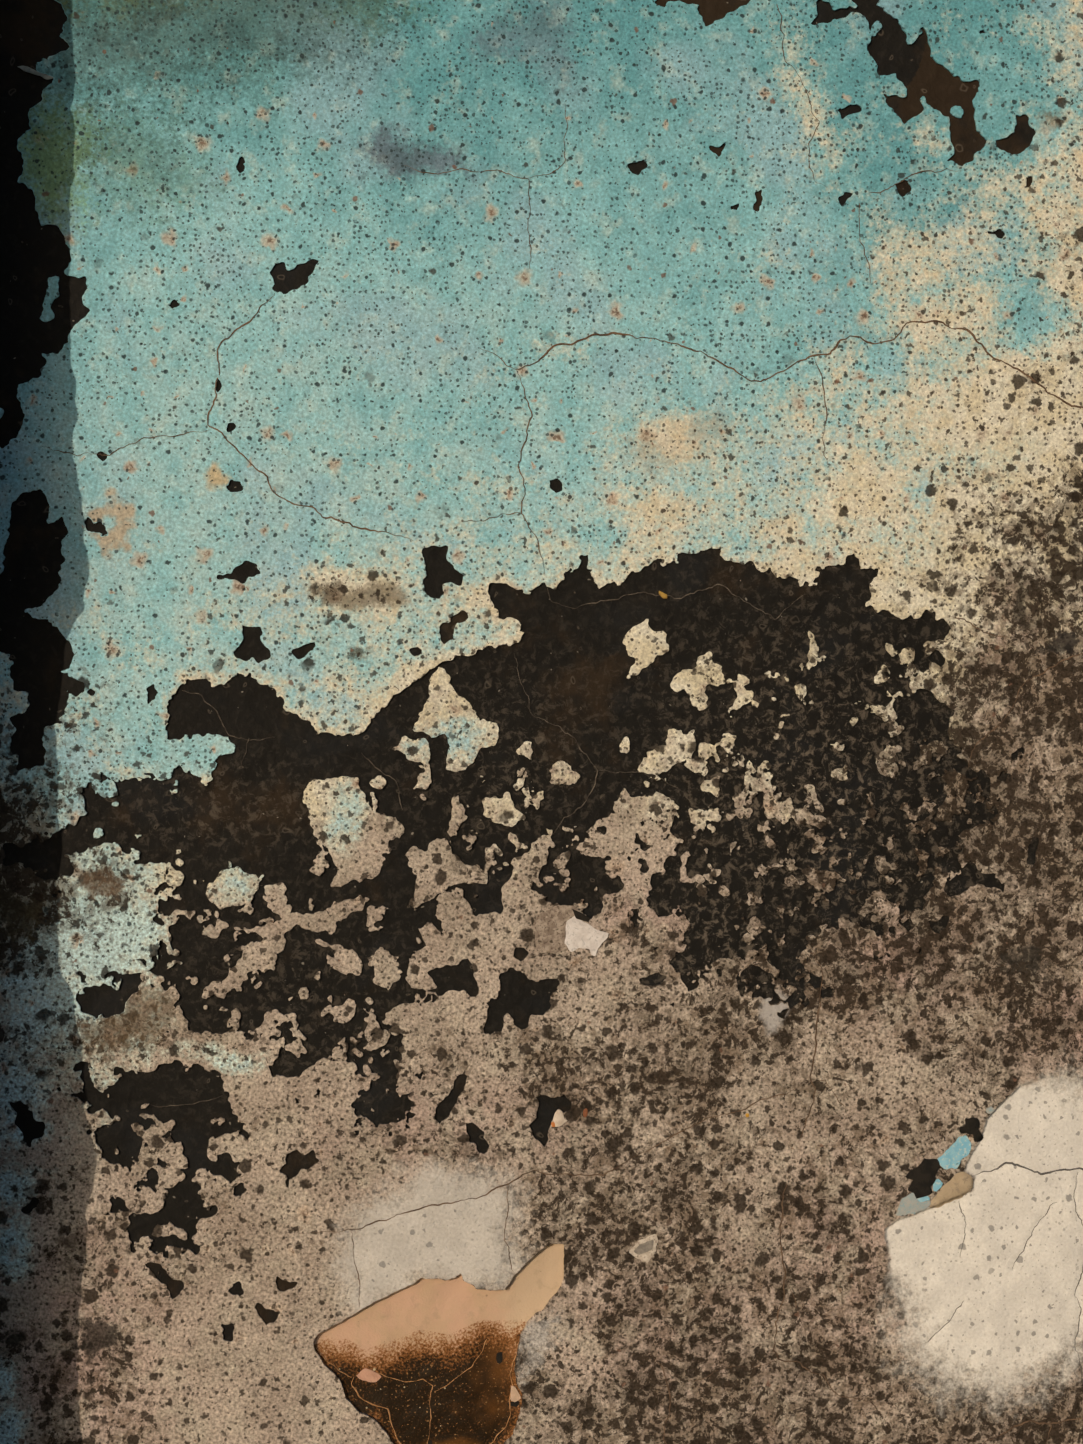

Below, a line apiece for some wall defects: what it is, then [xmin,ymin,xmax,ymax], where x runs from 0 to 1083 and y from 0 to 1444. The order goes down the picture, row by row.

peeling [811,0,1036,166]
peeling [0,0,90,448]
crack [45,296,413,541]
crack [468,320,1083,620]
peeling [0,489,95,771]
peeling [3,545,1024,1136]
peeling [57,1060,250,1299]
corrosion [313,1320,527,1444]
peeling [529,1095,572,1147]
crack [650,1178,906,1444]
crack [959,1162,1083,1266]
crack [1074,1266,1083,1382]